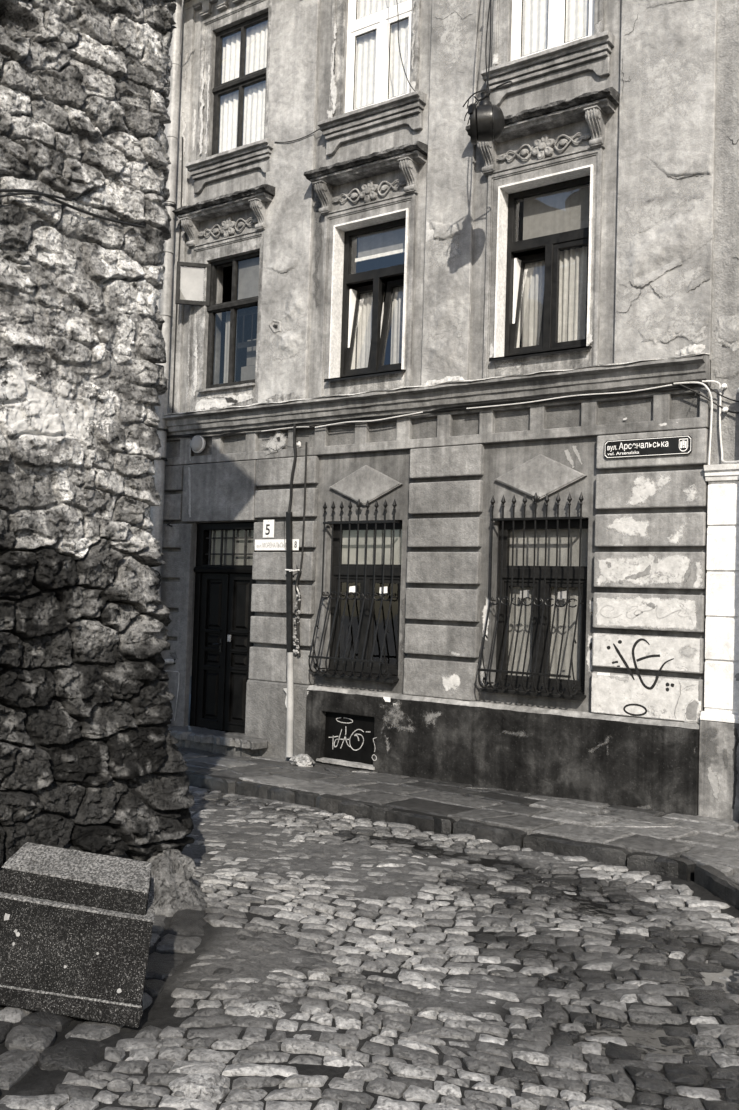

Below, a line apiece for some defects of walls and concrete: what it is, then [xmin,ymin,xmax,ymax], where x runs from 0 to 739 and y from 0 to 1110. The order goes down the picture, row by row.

peeling [442,674,460,691]
peeling [586,475,703,723]